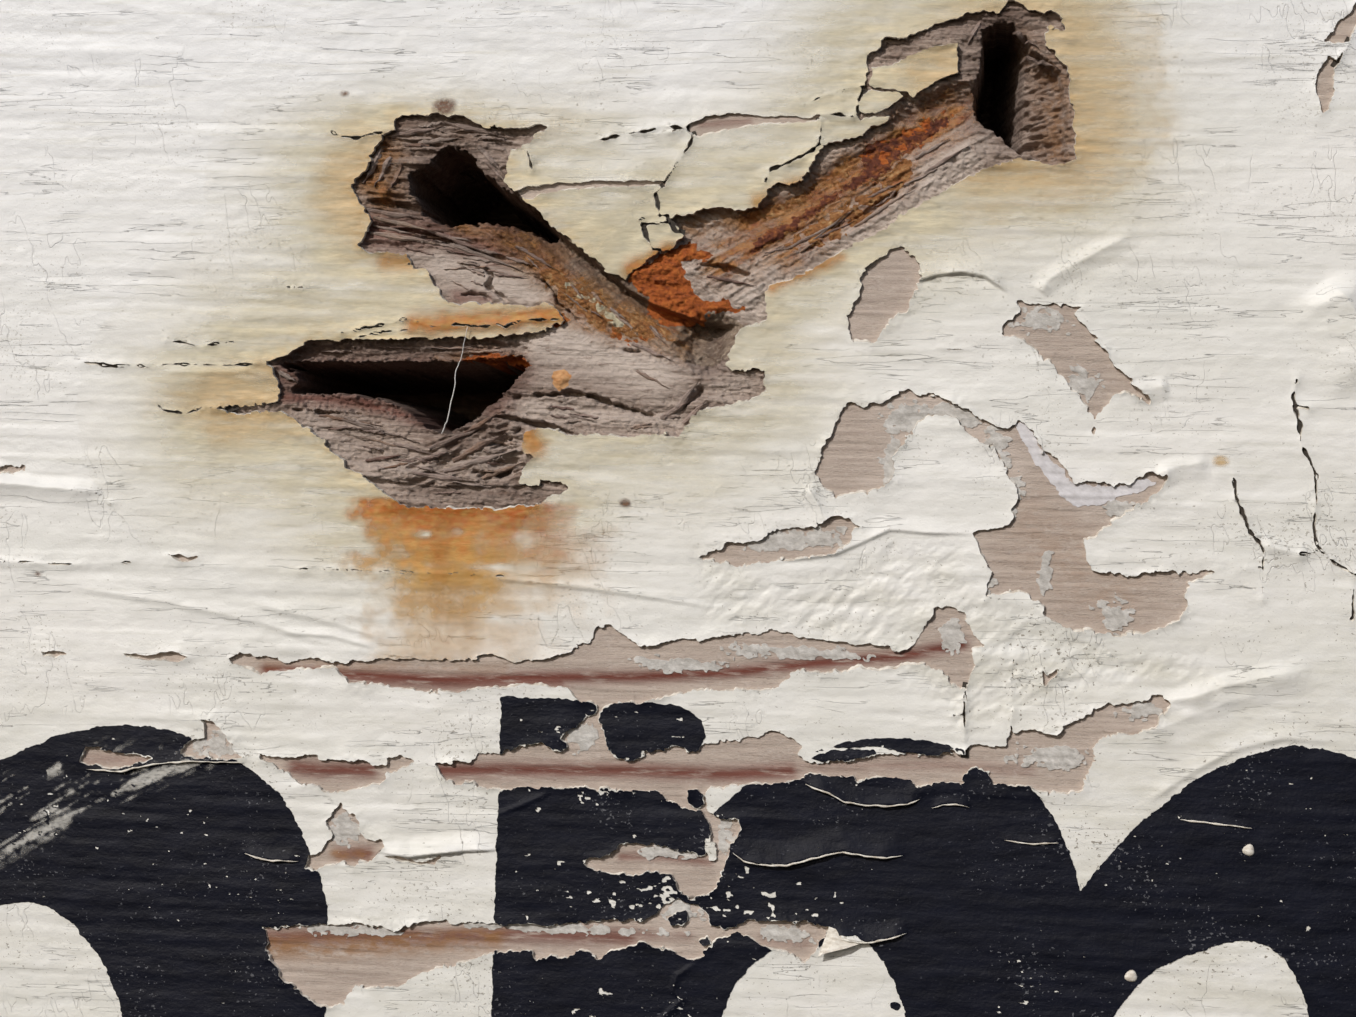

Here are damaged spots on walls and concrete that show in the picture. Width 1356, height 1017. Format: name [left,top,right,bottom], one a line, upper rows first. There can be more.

crack [602,125,697,254]
corrosion [408,46,970,348]
crack [765,86,867,182]
corrosion [971,0,1126,189]
peeling [509,327,766,437]
peeling [1002,300,1150,433]
corrosion [351,498,558,617]
peeling [700,515,863,567]
peeling [815,389,1214,636]
crack [1232,477,1264,587]
crack [1291,380,1356,619]
peeling [231,606,1170,1006]